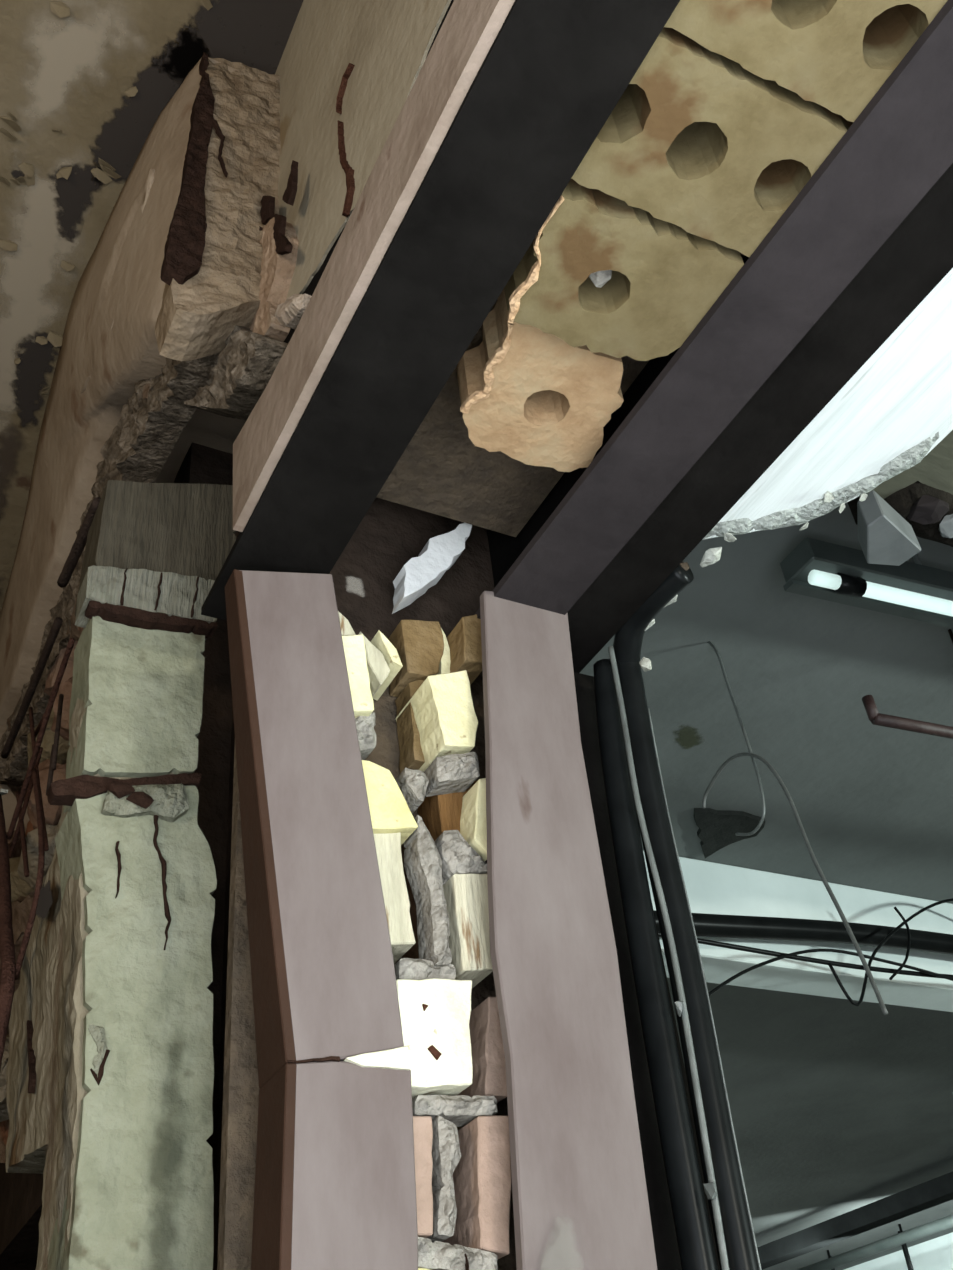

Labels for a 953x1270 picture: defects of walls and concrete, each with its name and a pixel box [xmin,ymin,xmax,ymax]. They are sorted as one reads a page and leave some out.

crack [336,63,355,217]
spalling [702,432,953,547]
spalling [0,353,217,1071]
crack [47,773,201,806]
crack [114,841,122,898]
crack [153,815,171,950]
spalling [88,1024,110,1085]
crack [287,1056,340,1064]
crack [463,1254,471,1270]